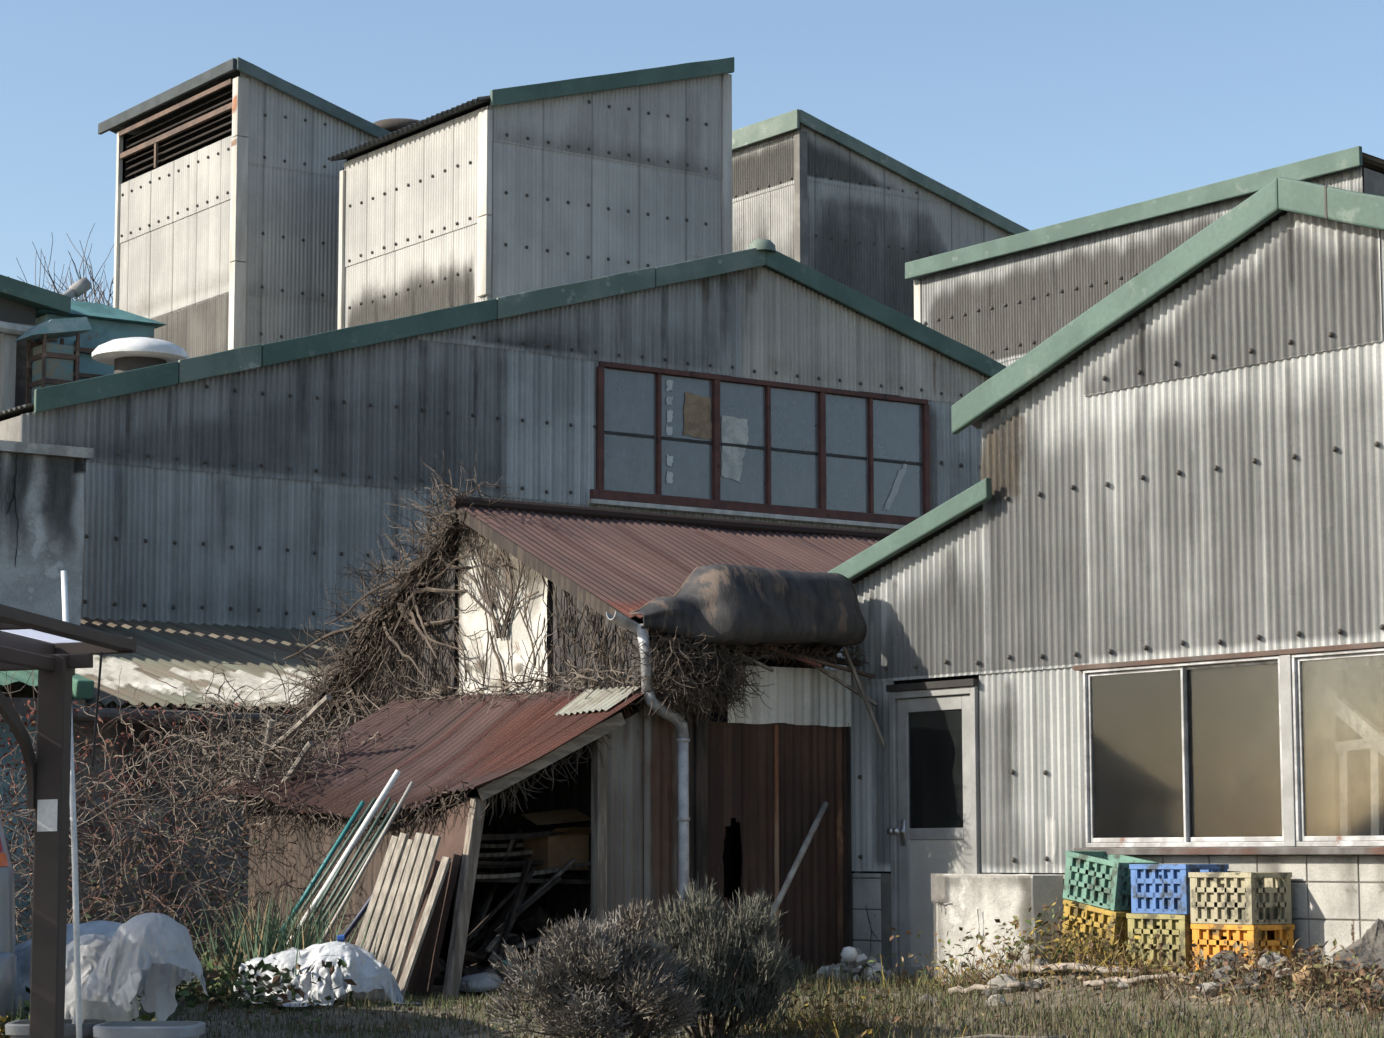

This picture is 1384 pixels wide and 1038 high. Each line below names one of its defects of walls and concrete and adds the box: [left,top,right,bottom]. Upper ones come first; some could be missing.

leakage [732,141,877,198]
leakage [348,270,474,327]